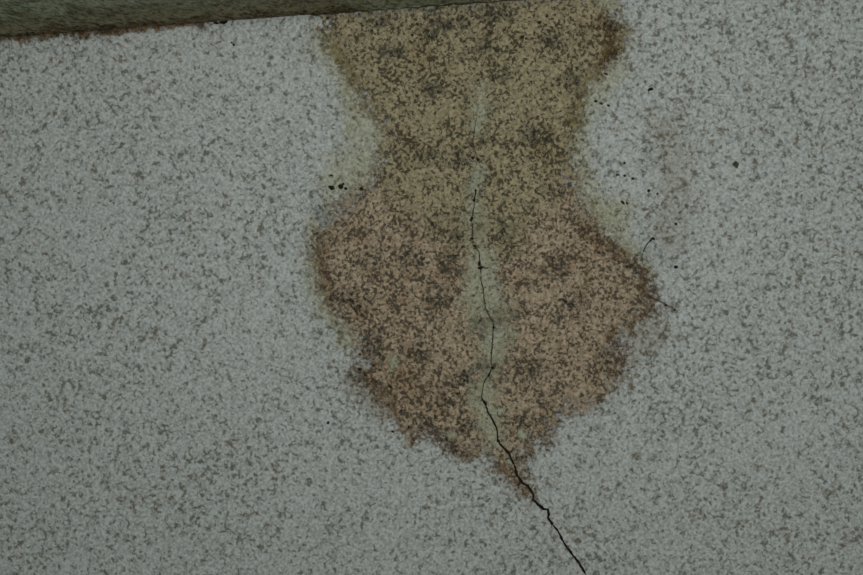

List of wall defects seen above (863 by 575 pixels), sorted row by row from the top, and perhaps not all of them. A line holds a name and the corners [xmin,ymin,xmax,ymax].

leakage [0,0,676,502]
crack [470,104,586,574]